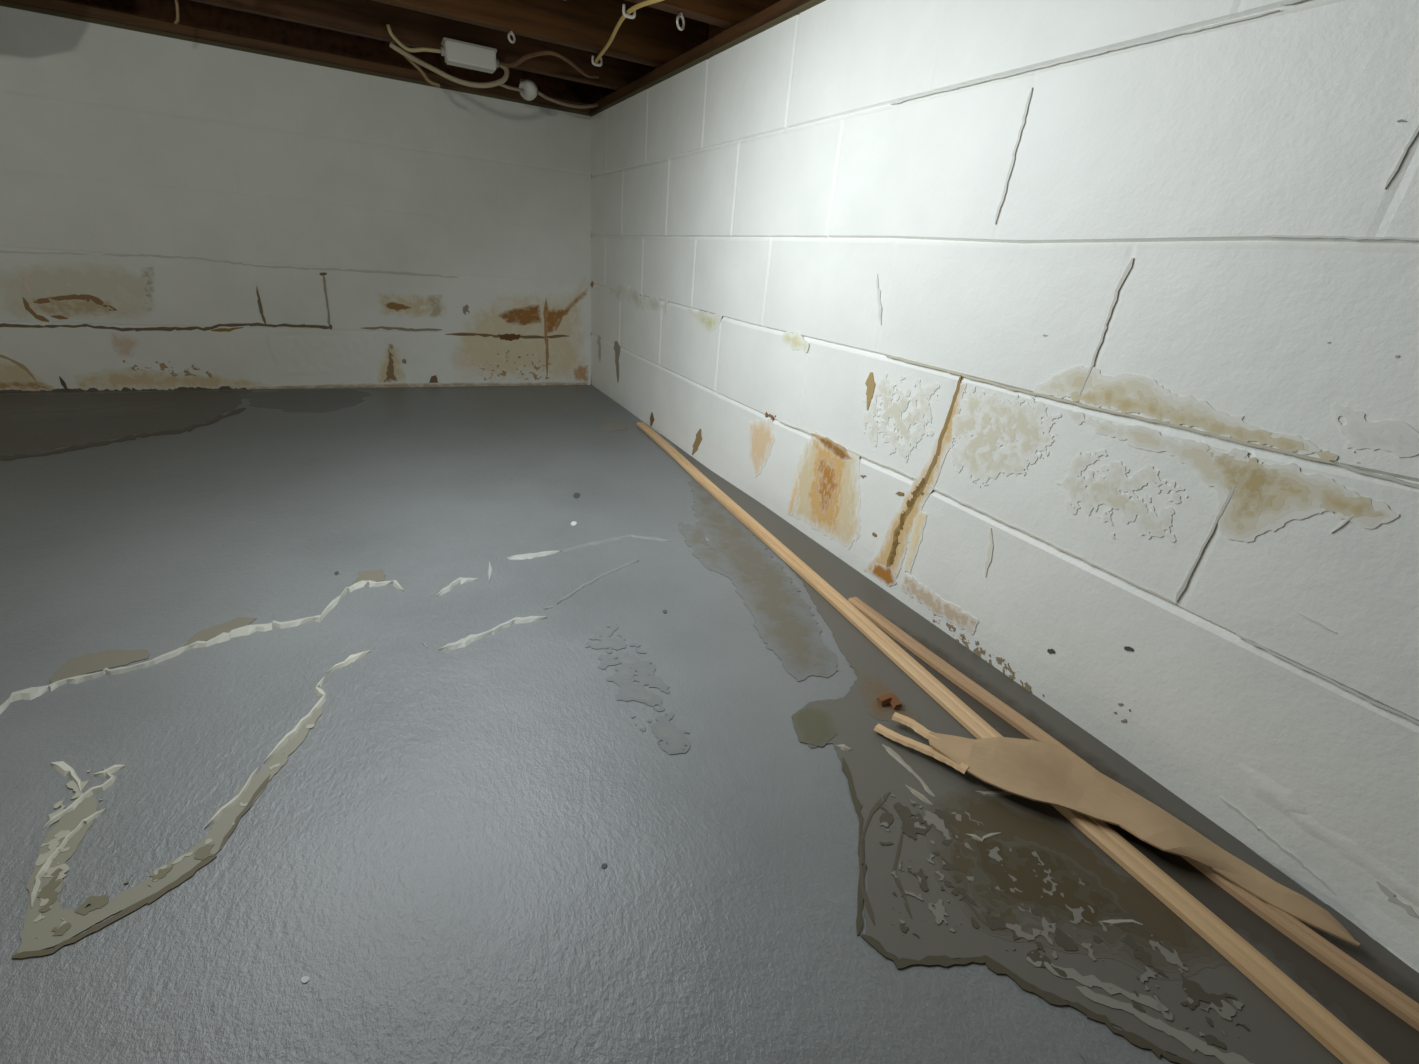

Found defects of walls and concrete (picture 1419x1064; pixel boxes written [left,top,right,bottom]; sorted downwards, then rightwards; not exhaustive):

crack [890,0,1304,224]
crack [1384,125,1419,189]
crack [0,250,569,339]
water stain [0,260,587,461]
rust [376,275,593,383]
rust [788,375,967,586]
water stain [861,372,940,462]
crack [778,420,1236,604]
crack [876,258,1419,489]
water stain [949,366,1419,543]
peeling [12,650,371,959]
water stain [662,435,1419,1064]